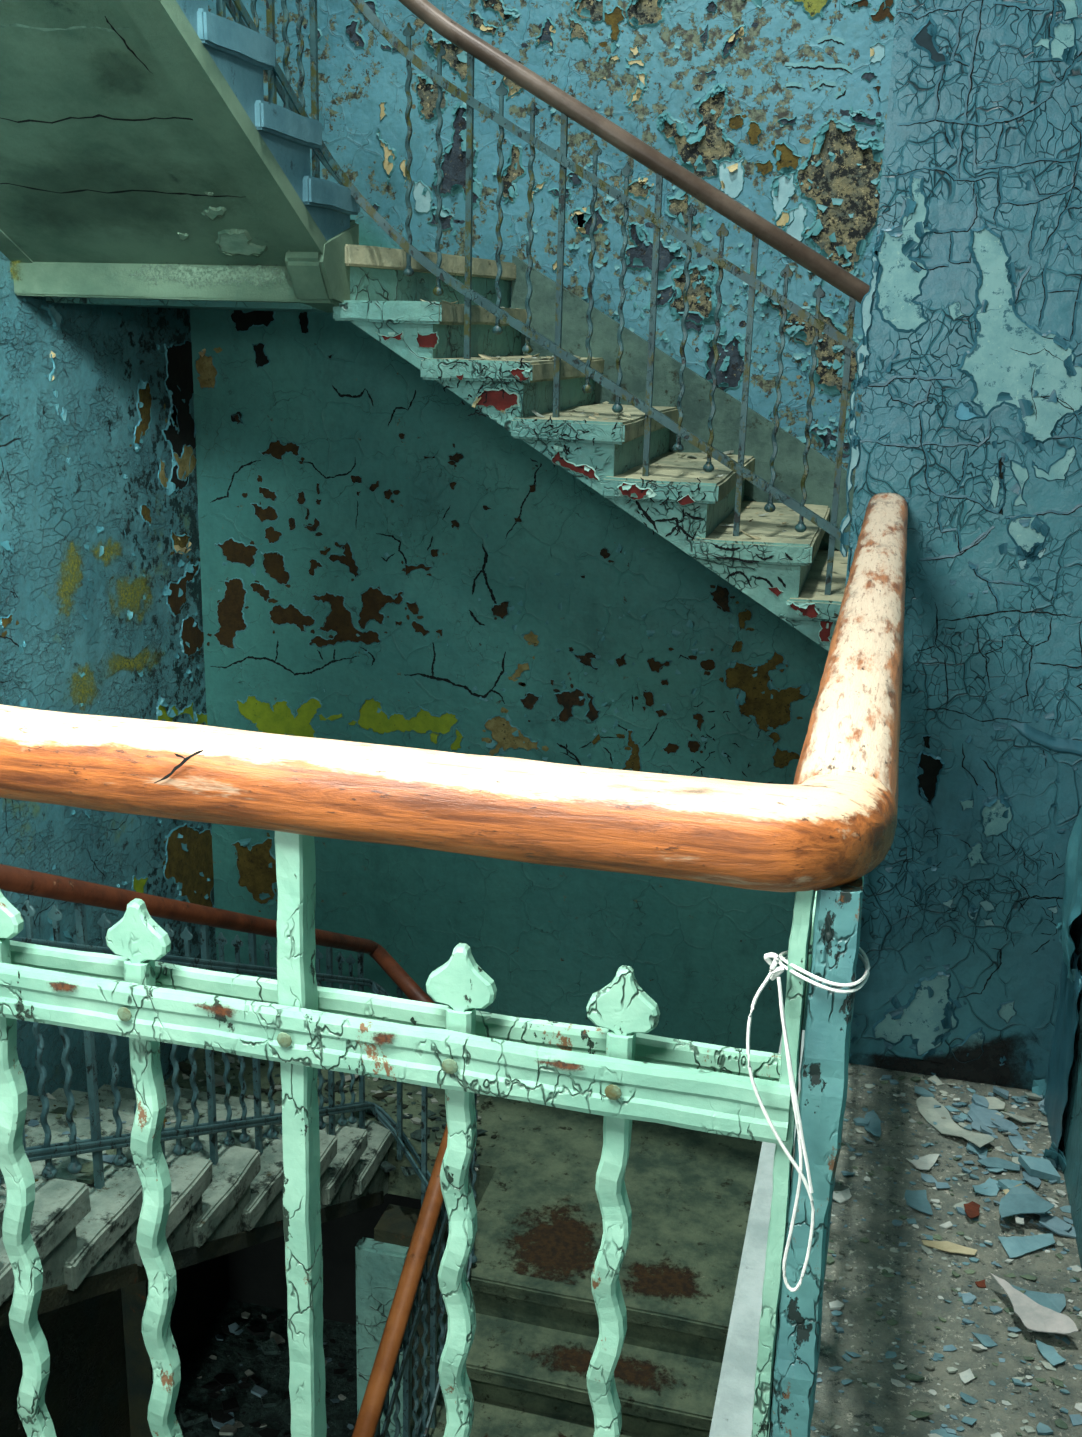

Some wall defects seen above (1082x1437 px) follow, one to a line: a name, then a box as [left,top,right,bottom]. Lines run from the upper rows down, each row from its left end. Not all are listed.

crack [1,114,193,124]
peeling [518,0,672,109]
peeling [614,177,747,392]
peeling [656,0,938,557]
crack [880,0,1082,440]
peeling [162,475,444,661]
peeling [234,695,464,751]
crack [210,641,506,704]
crack [332,358,617,625]
crack [626,477,793,588]
crack [860,375,1082,795]
peeling [948,224,1082,570]